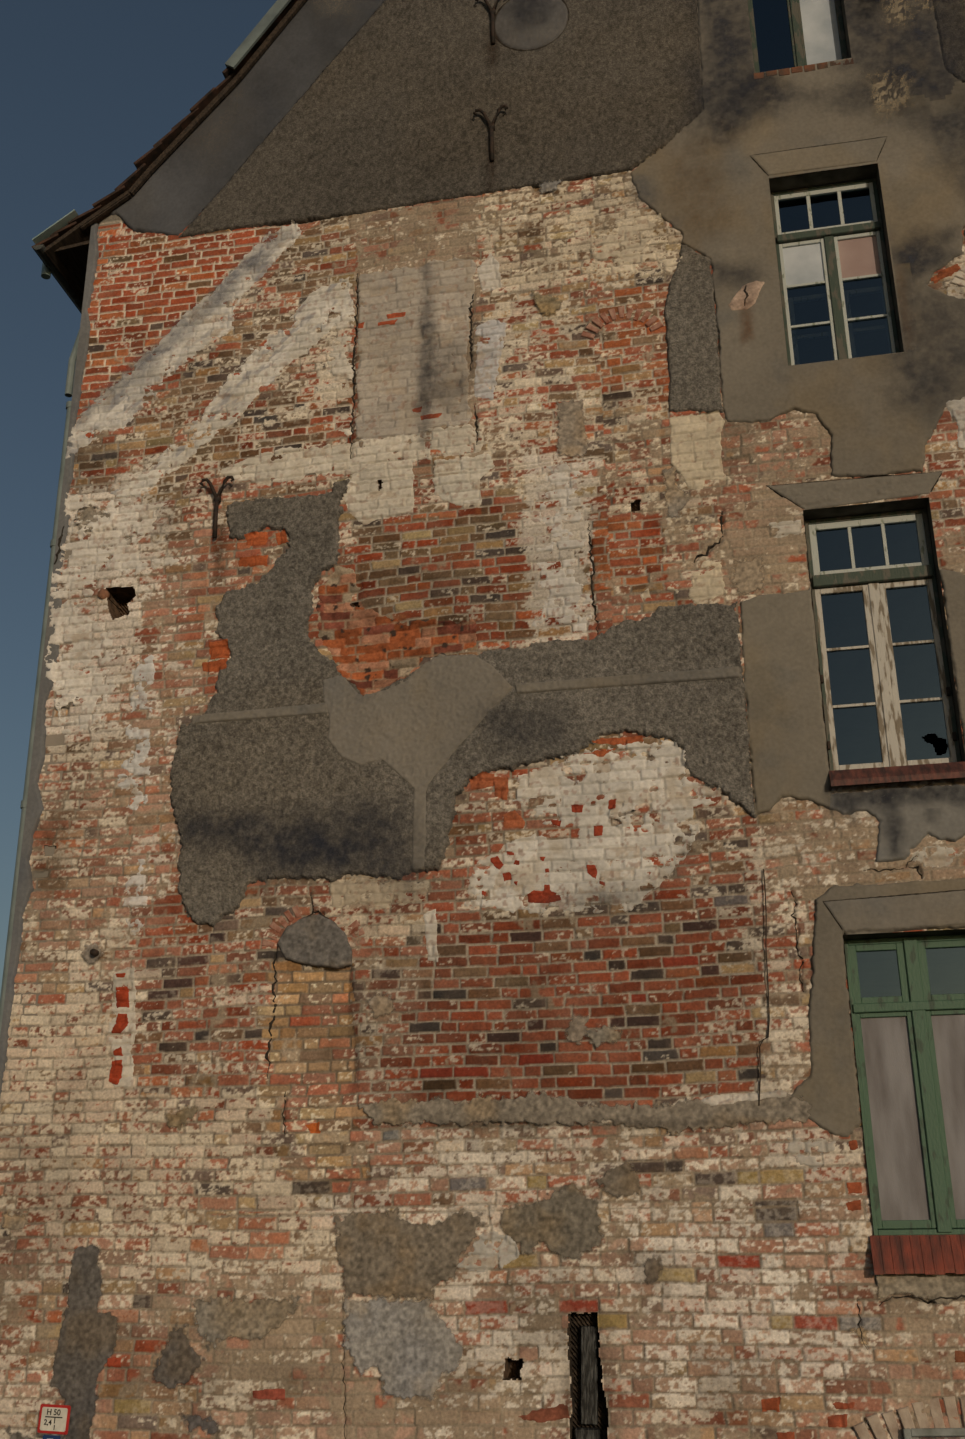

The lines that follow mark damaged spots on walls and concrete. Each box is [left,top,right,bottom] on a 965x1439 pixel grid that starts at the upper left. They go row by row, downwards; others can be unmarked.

flaking render [0,0,965,1096]
crack [694,511,723,563]
flaking render [702,785,965,1172]
crack [265,945,286,1134]
spalling [305,1122,321,1133]
spalling [846,1182,862,1211]
peeling [457,1231,520,1272]